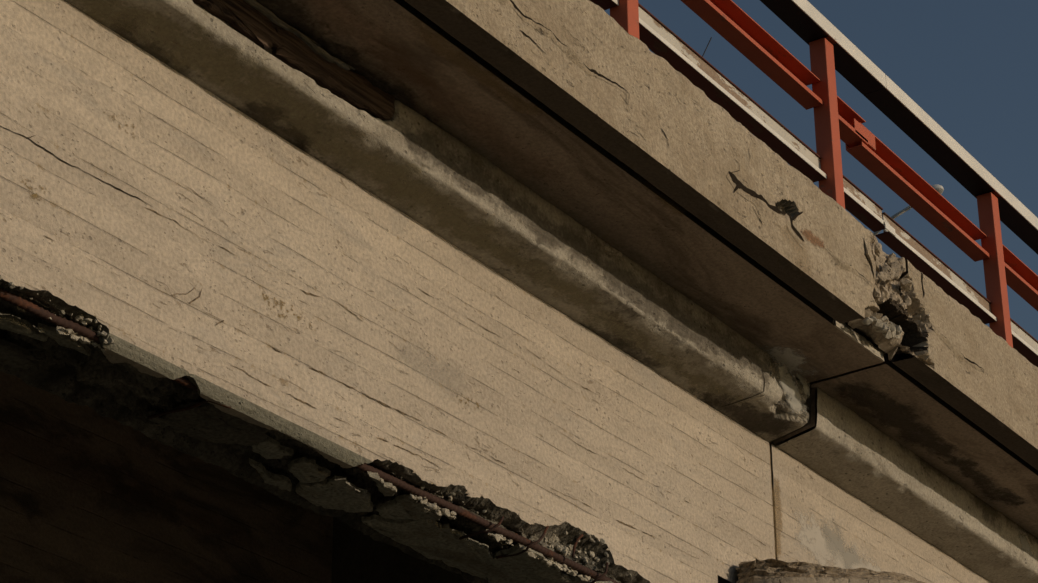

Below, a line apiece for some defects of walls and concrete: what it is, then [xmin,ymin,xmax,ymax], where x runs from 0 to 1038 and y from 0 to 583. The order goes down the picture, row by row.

crack [498,0,630,102]
crack [1,126,365,323]
crack [727,153,875,286]
spalling [834,232,935,369]
spalling [0,276,650,583]
water stain [701,394,793,443]
water stain [766,346,817,411]
water stain [837,384,1024,505]